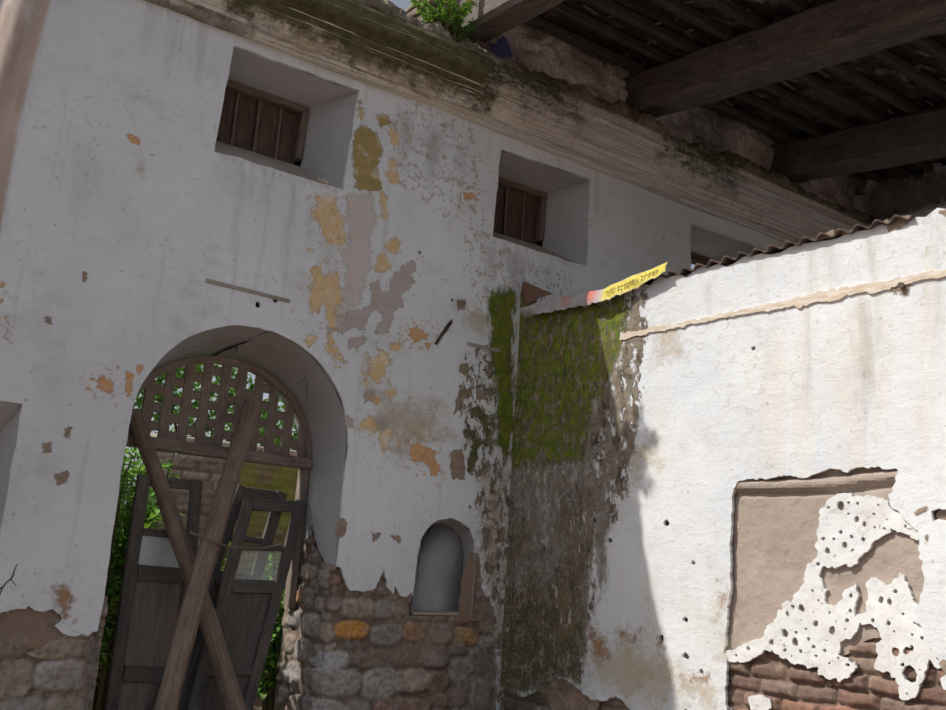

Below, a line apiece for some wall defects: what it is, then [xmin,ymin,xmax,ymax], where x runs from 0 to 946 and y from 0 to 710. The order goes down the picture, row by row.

water stain [144,0,584,121]
spalling [884,215,910,232]
peeling [78,363,144,409]
spalling [274,102,648,710]
water stain [500,302,620,696]
crack [0,564,18,594]
spalling [0,585,108,710]
spalling [726,467,946,710]